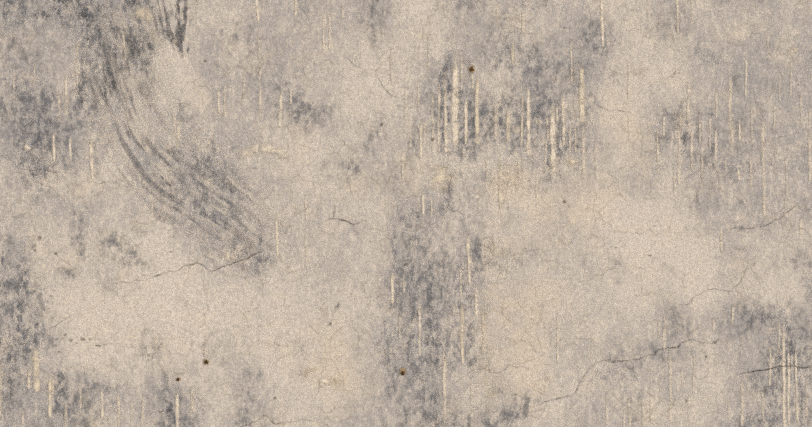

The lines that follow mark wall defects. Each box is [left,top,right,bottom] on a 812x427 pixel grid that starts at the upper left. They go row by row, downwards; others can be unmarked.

water stain [0,68,83,160]
water stain [99,31,151,100]
water stain [409,58,597,178]
water stain [674,87,726,194]
water stain [3,266,37,340]
water stain [391,271,448,355]
water stain [436,236,484,412]
water stain [769,323,807,427]